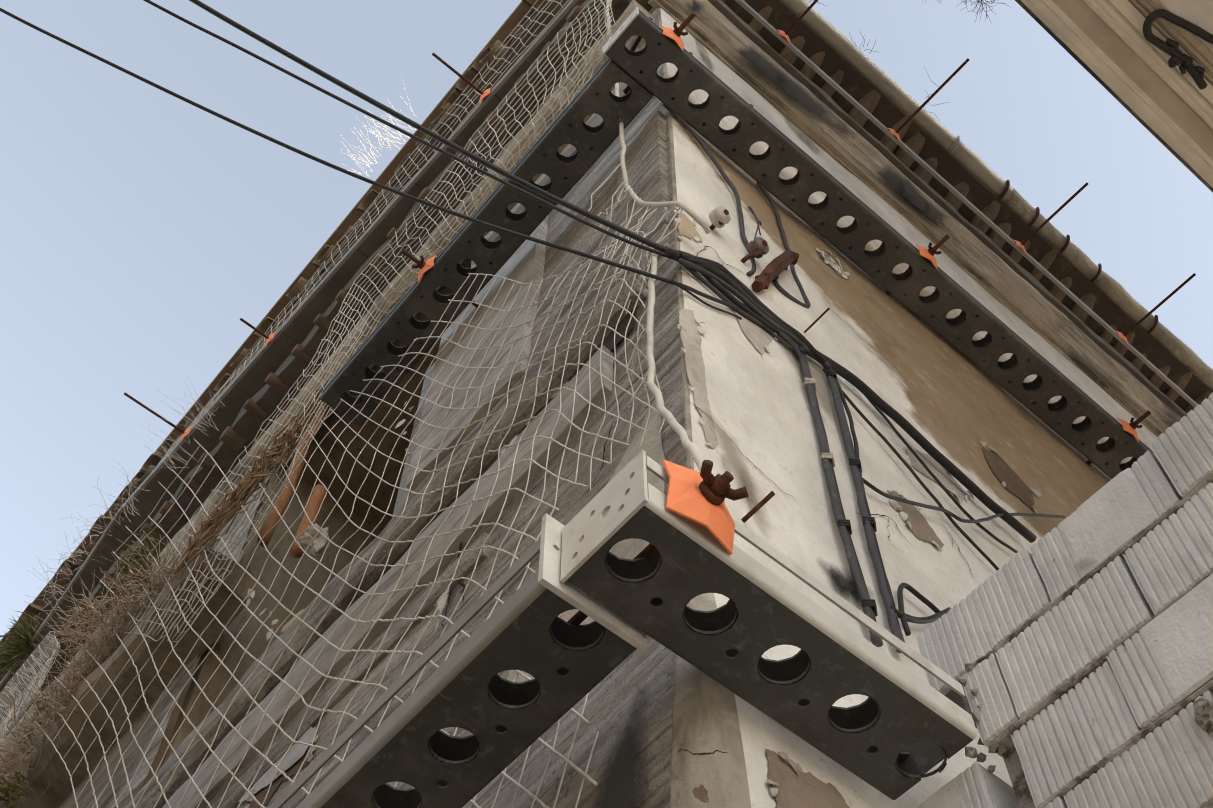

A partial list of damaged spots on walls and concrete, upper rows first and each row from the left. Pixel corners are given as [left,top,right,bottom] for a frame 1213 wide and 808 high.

spalling [677,308,719,449]
peeling [979,441,1042,513]
peeling [887,488,944,551]
peeling [765,748,849,808]